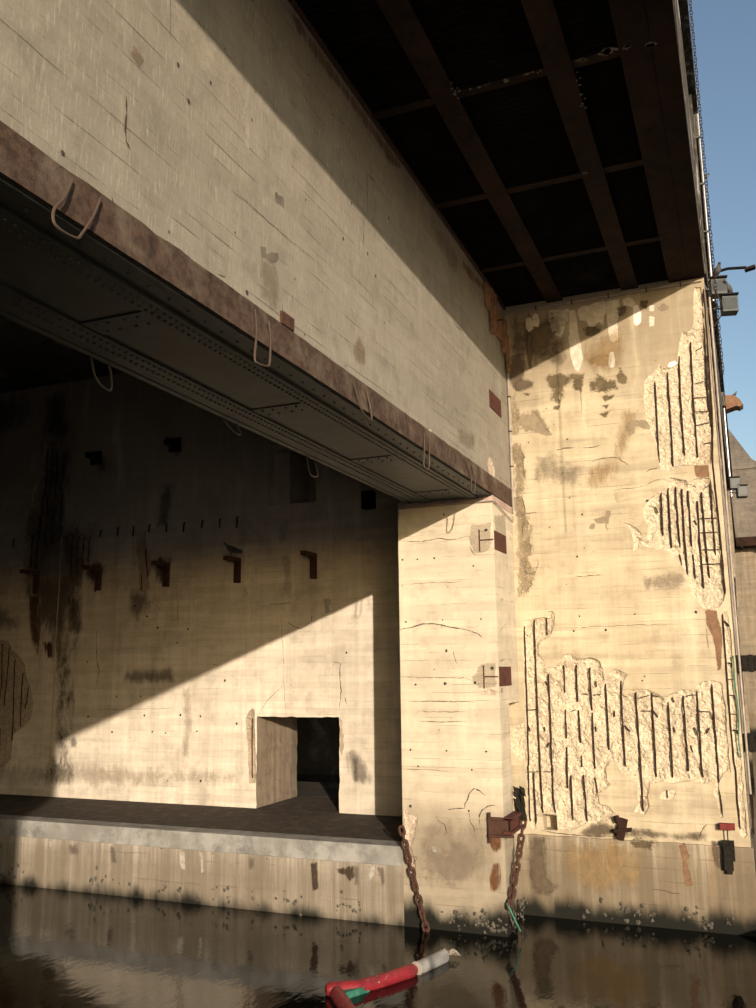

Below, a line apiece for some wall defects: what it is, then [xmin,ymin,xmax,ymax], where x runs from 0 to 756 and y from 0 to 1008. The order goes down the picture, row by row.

leakage [510,297,655,594]
spalling [0,640,33,768]
leakage [28,451,81,631]
spalling [510,287,755,838]
rust [705,610,722,670]
rust [679,843,693,886]